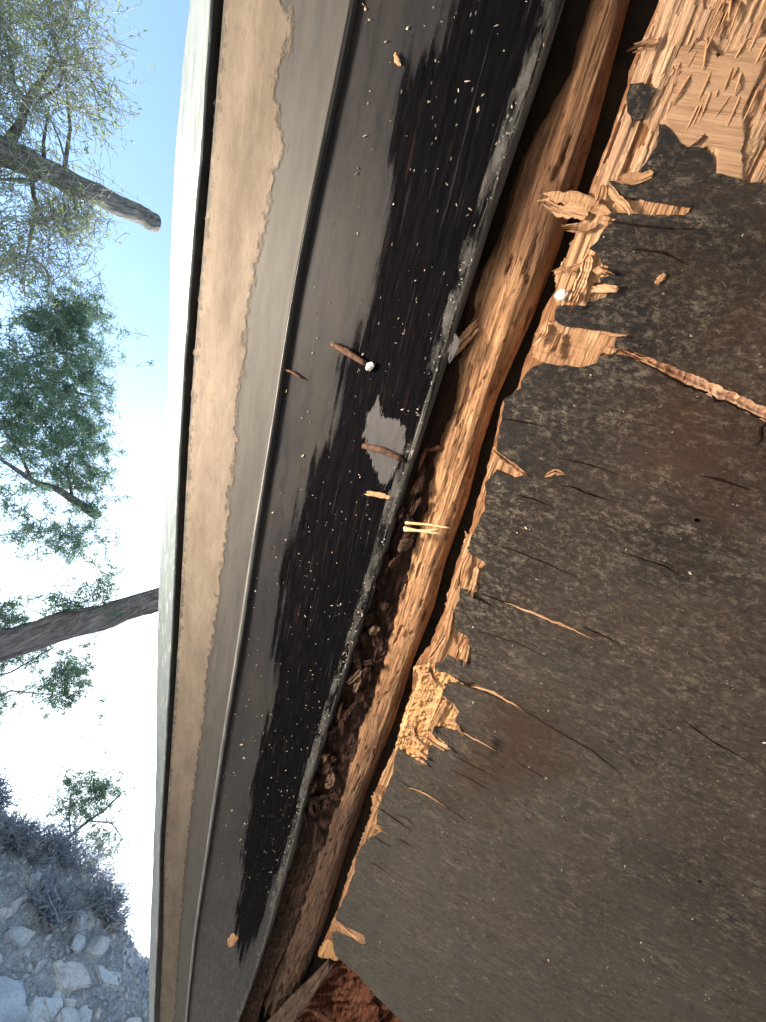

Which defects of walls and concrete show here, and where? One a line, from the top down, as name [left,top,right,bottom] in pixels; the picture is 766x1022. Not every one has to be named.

peeling [478,37,541,205]
peeling [537,0,766,313]
peeling [432,291,460,363]
peeling [532,320,627,367]
crack [610,346,766,445]
peeling [479,447,529,501]
crack [702,476,753,491]
peeling [249,396,426,978]
peeling [318,531,486,961]
peeling [346,974,383,1022]